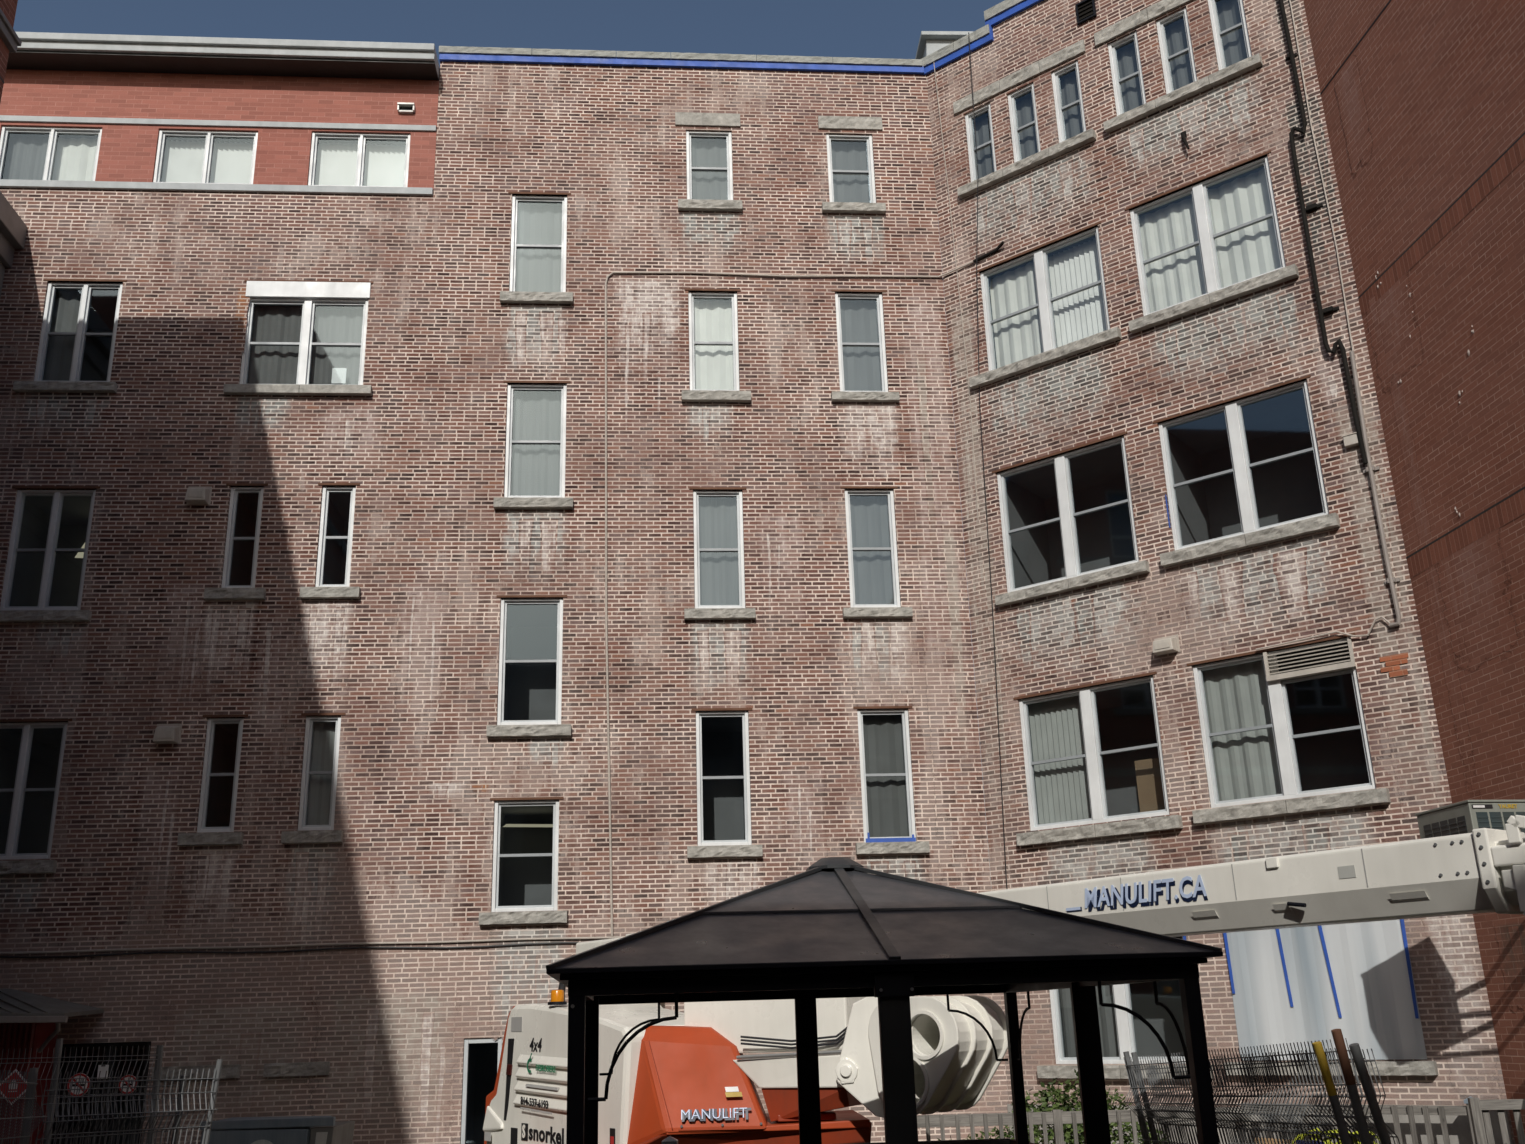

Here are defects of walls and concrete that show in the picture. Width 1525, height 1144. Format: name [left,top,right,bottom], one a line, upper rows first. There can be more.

leakage [675,211,747,265]
leakage [822,213,889,275]
leakage [500,303,573,380]
leakage [611,277,685,432]
leakage [683,402,739,454]
leakage [961,0,1448,864]
leakage [1435,528,1519,672]